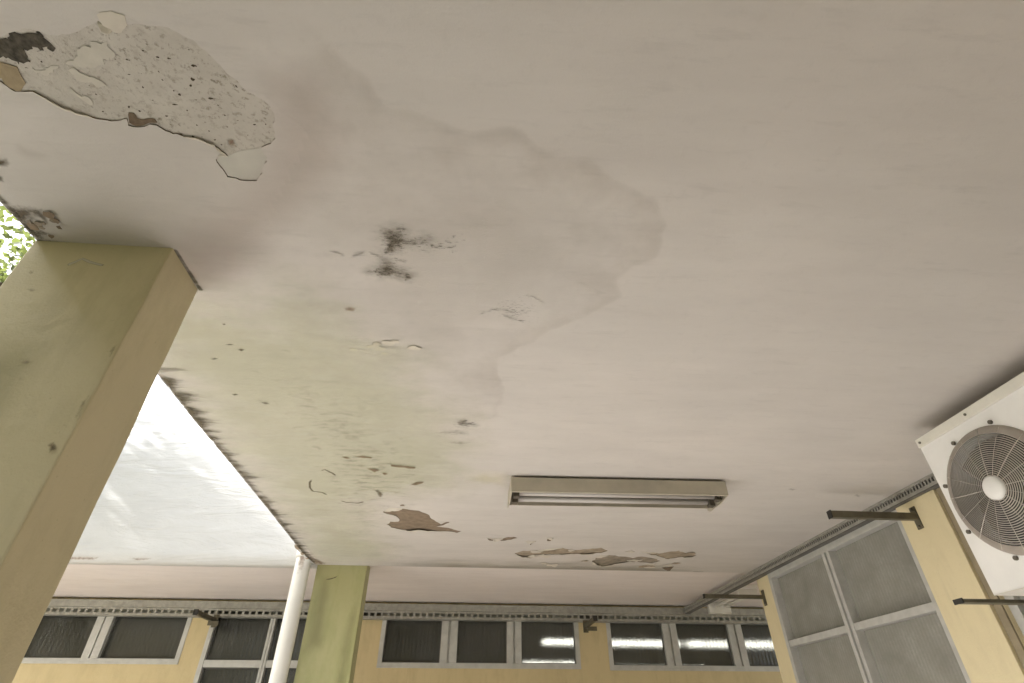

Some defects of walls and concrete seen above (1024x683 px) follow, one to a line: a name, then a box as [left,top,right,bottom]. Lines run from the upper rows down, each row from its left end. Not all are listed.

peeling [0,11,275,181]
peeling [0,197,62,240]
water stain [158,369,315,563]
peeling [383,508,461,533]
peeling [487,537,696,571]